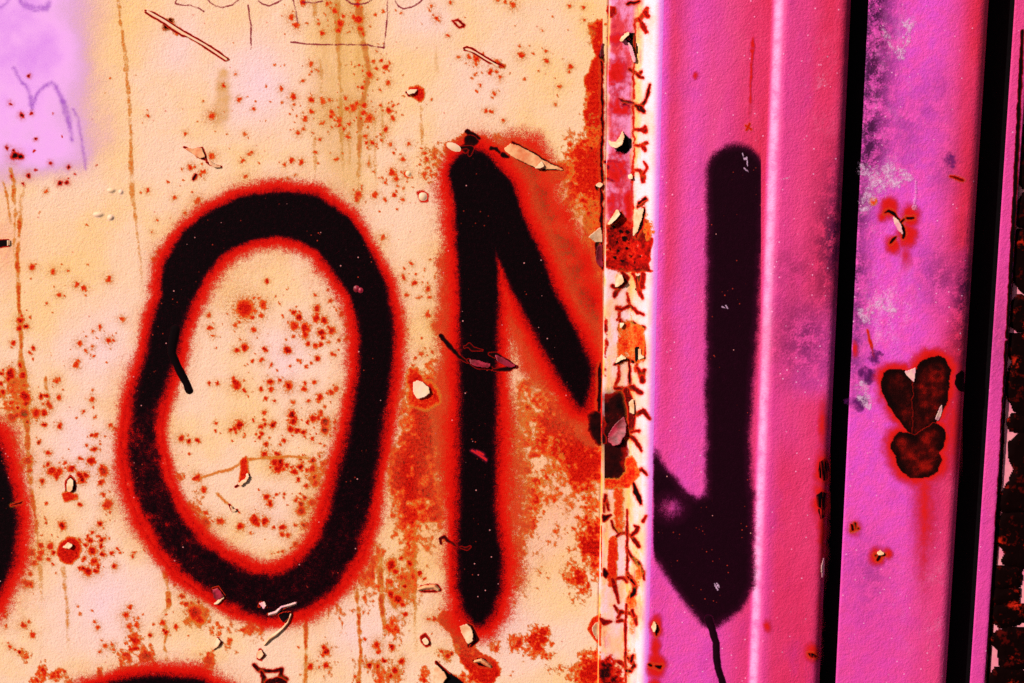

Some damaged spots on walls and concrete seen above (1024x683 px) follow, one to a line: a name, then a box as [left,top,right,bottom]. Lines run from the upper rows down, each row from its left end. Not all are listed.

peeling [504,140,564,171]
corrosion [547,4,655,299]
corrosion [869,197,920,261]
corrosion [0,137,144,595]
corrosion [175,278,349,554]
peeling [413,380,430,399]
corrosion [327,258,645,683]
peeling [470,355,515,368]
peeling [587,399,634,446]
corrosion [875,347,965,577]
corrosion [1001,396,1017,491]
corrosion [985,612,998,683]